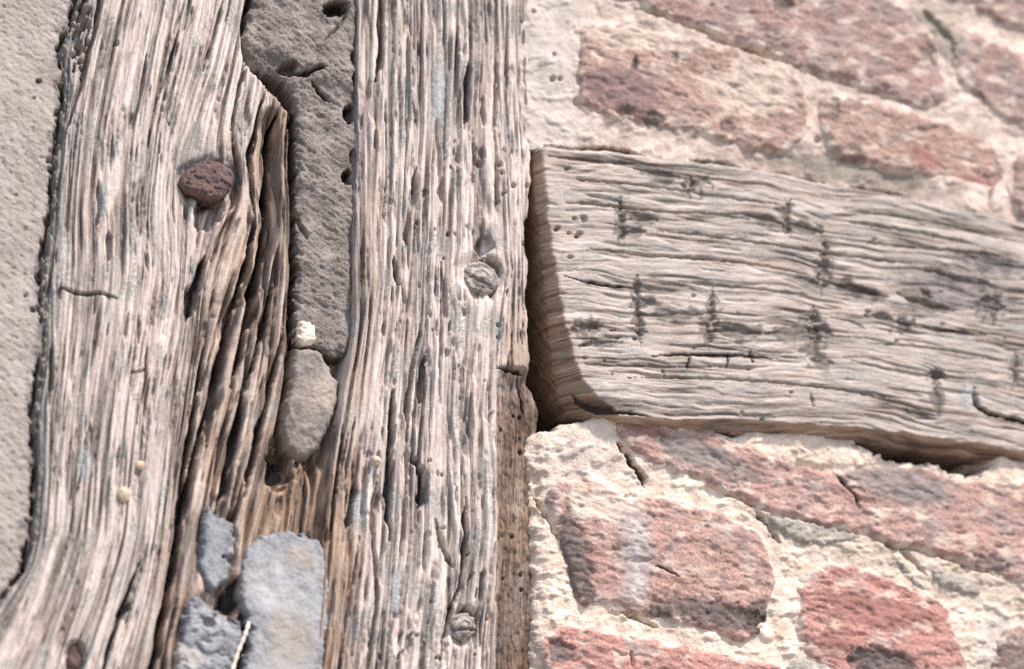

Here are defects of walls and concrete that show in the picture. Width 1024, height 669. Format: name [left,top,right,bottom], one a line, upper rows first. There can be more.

crack [618,447,643,486]